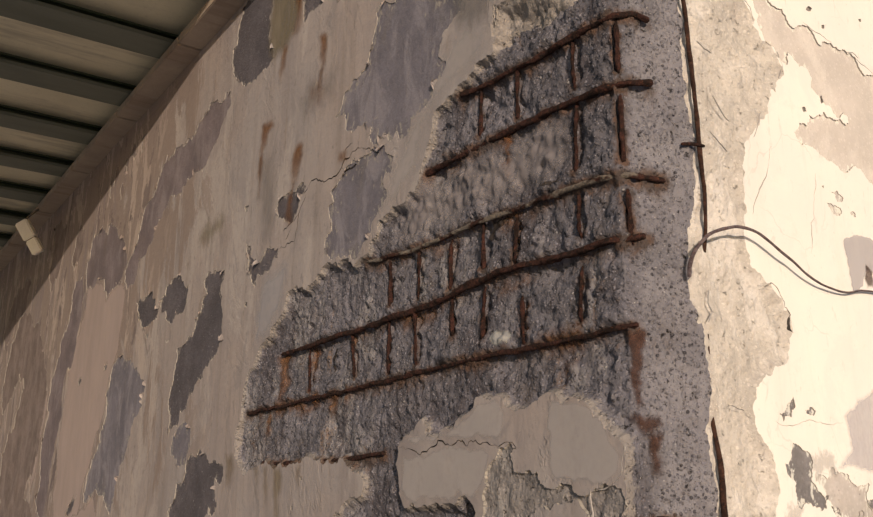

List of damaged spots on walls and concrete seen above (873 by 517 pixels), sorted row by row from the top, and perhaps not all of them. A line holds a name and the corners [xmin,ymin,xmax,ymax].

rust [293,145,302,167]
crack [280,143,378,248]
peeling [0,0,274,517]
spalling [234,0,873,517]
rust [629,331,646,403]
crack [408,440,516,455]